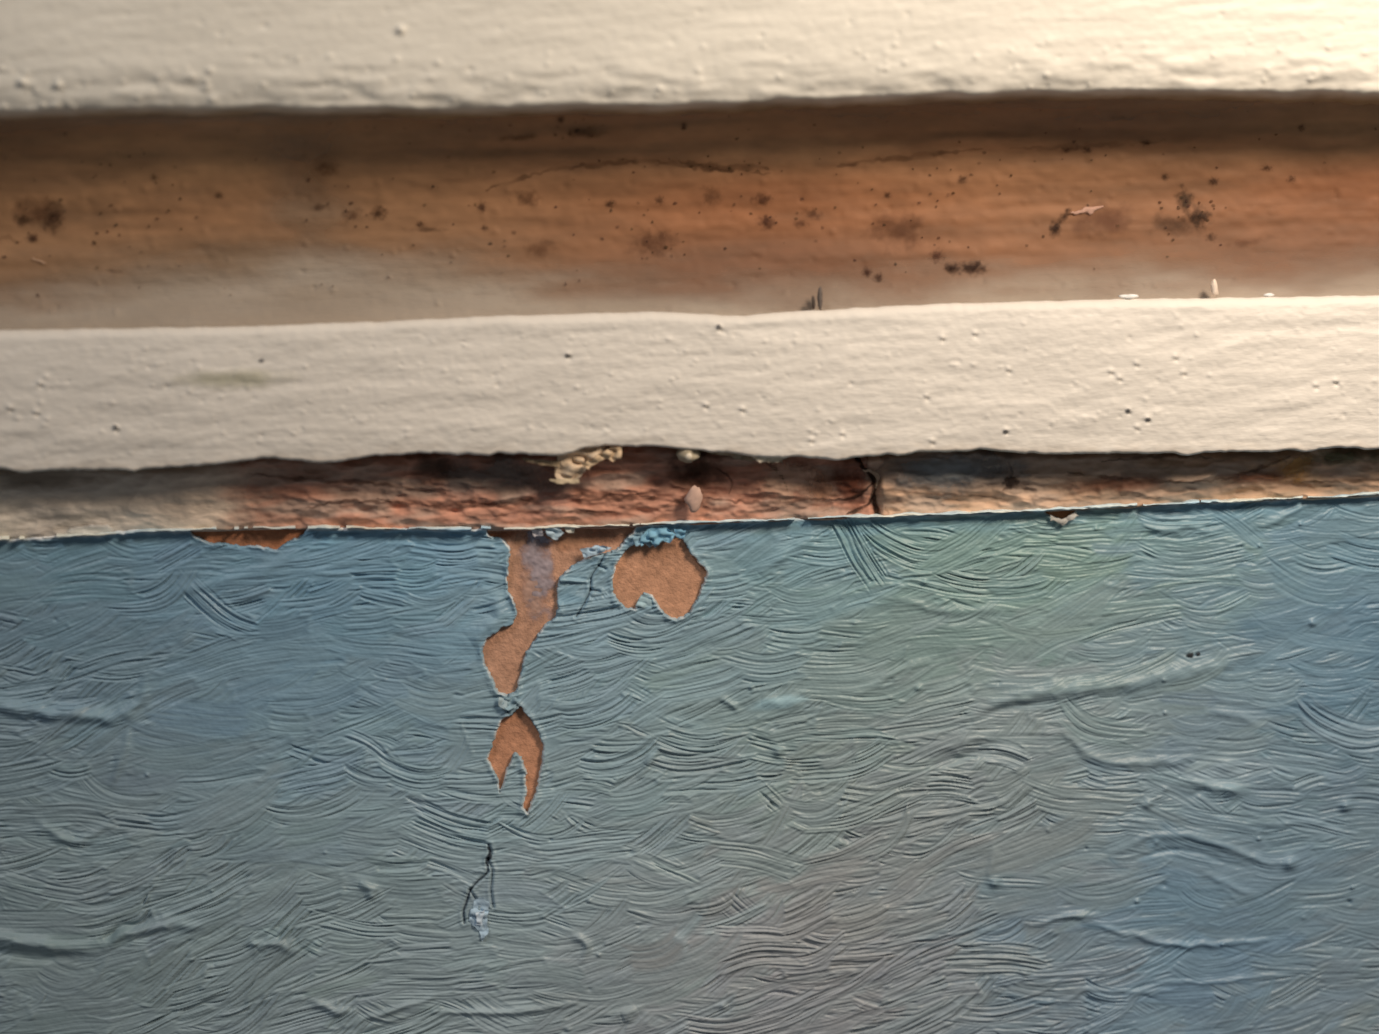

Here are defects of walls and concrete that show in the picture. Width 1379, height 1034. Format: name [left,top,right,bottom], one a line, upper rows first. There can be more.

damp [0,101,1379,296]
peeling [192,446,1379,811]
crack [463,845,492,941]